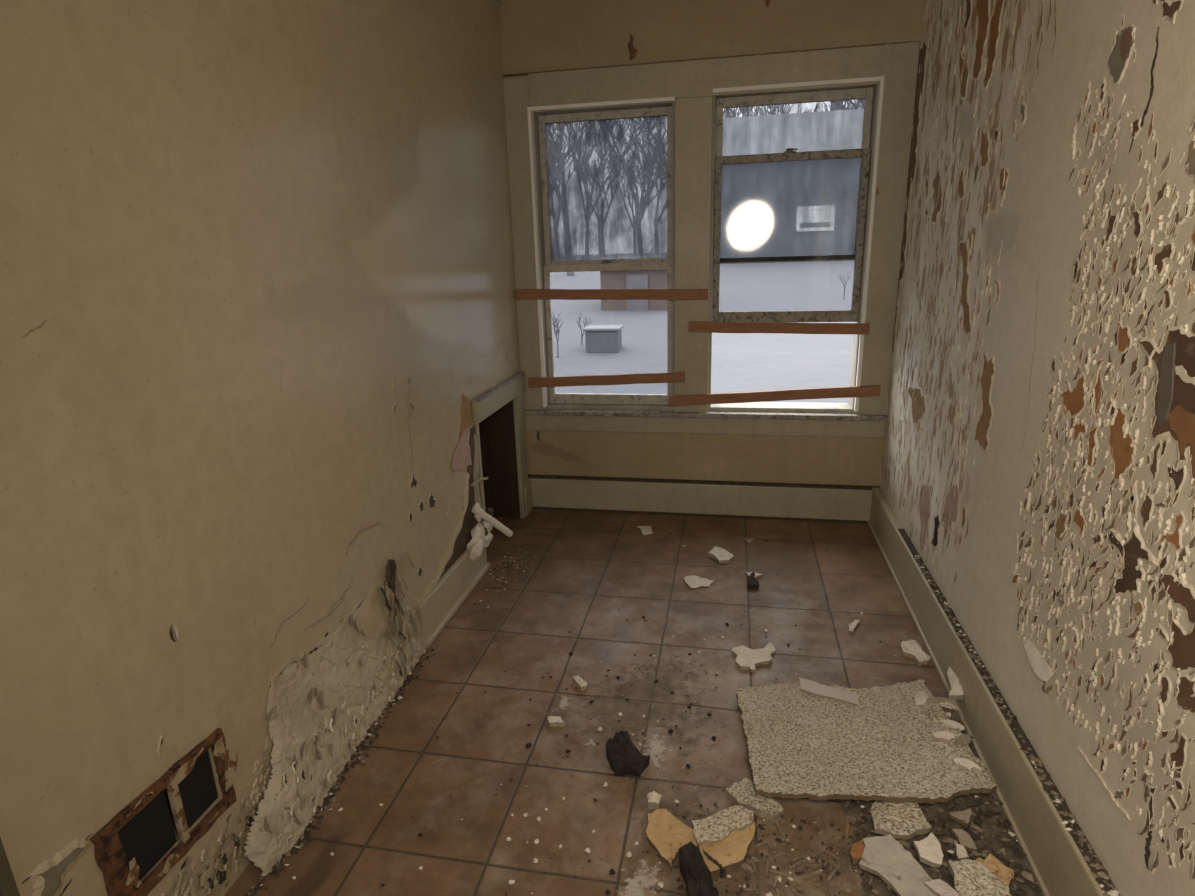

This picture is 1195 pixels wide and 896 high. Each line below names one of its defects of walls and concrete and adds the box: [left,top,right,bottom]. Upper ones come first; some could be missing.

peeling [1152,0,1184,25]
crack [1129,27,1159,153]
peeling [879,0,1051,587]
peeling [408,471,436,528]
peeling [1011,14,1195,879]
spalling [244,552,426,875]
peeling [915,691,981,770]